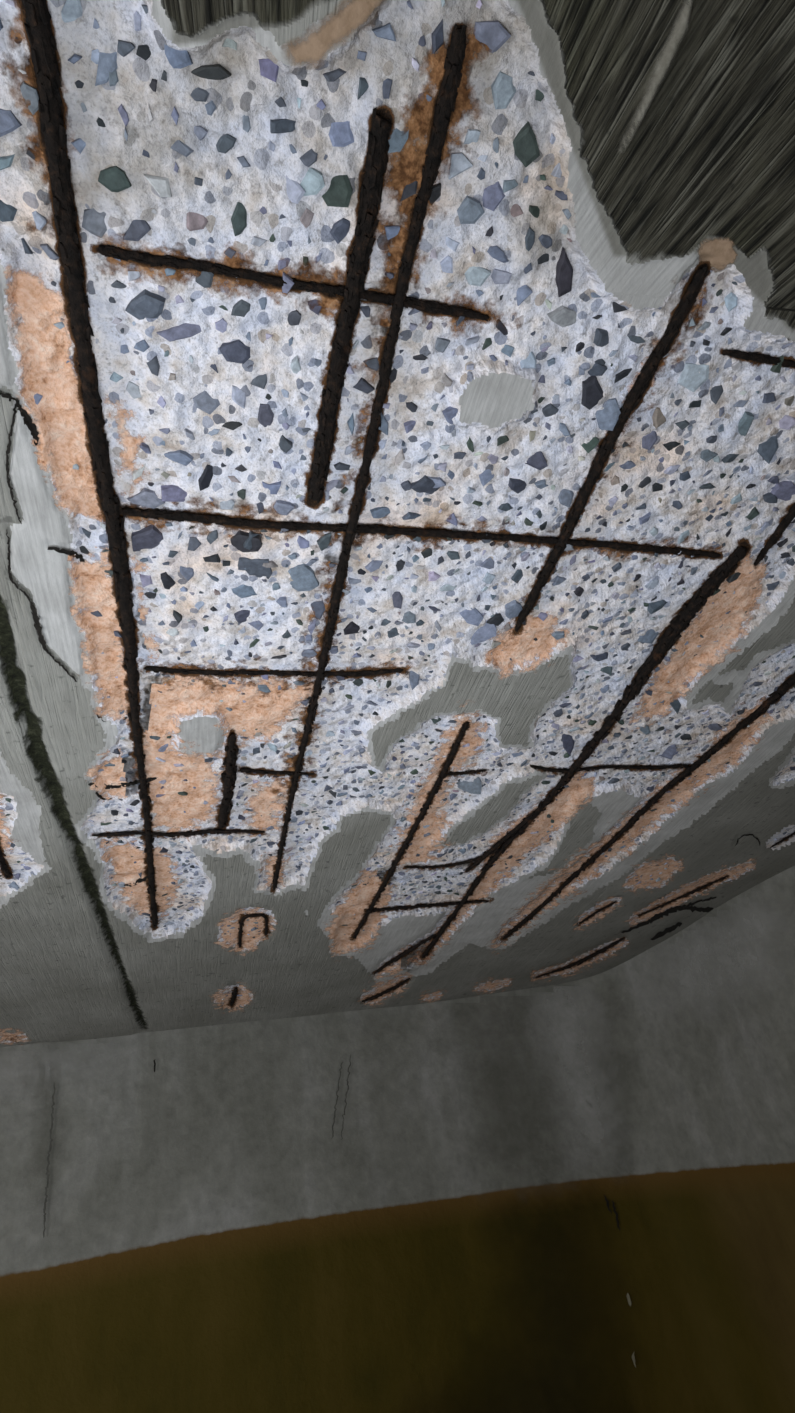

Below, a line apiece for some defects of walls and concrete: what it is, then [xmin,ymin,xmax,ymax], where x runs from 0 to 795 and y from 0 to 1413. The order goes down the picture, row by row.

rust [102,234,345,318]
rust [371,27,490,345]
rust [5,266,104,522]
rust [106,399,166,531]
spalling [0,0,795,1004]
rust [67,504,632,918]
rust [630,545,768,731]
rust [209,982,253,1014]
rust [214,907,278,956]
rust [358,771,595,1006]
rust [487,696,774,981]
crack [43,1083,55,1238]